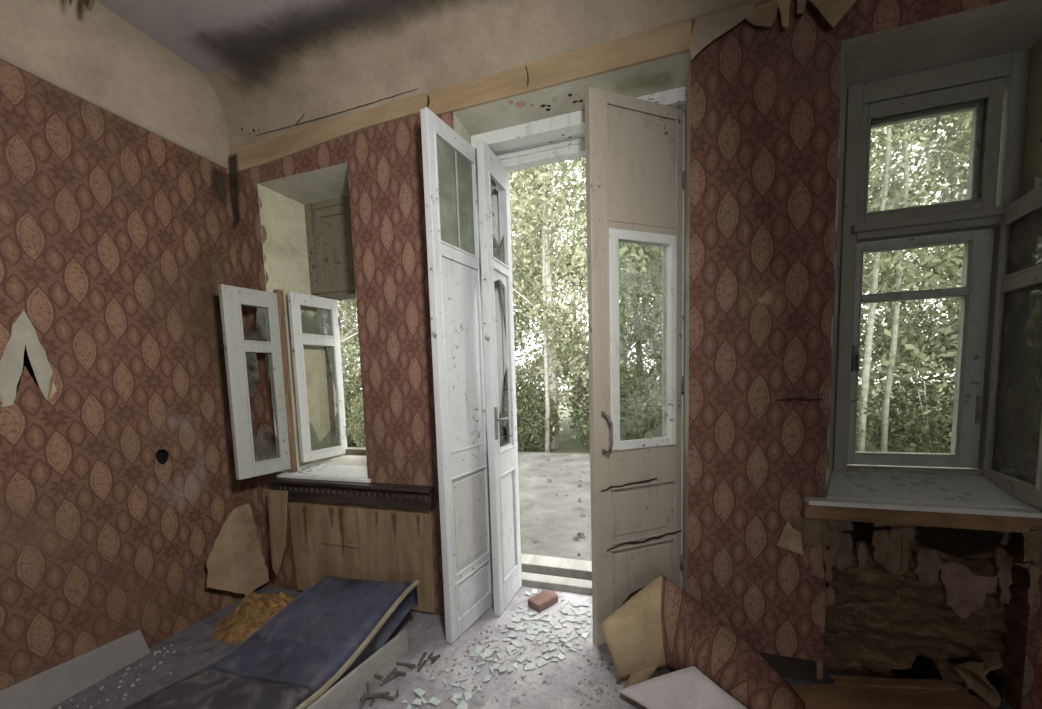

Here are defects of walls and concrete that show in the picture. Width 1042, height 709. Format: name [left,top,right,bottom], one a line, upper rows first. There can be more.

leakage [207,0,442,80]
peeling [689,0,807,60]
peeling [0,310,57,407]
spalling [790,515,1042,700]